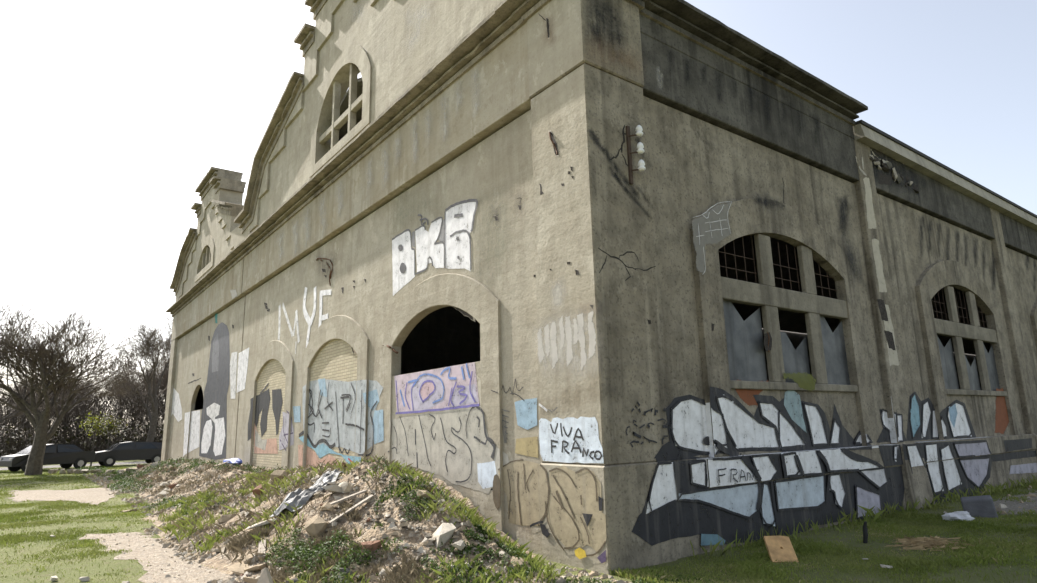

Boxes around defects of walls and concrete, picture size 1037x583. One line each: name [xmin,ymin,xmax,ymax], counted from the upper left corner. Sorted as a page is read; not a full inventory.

crack [598,248,656,281]